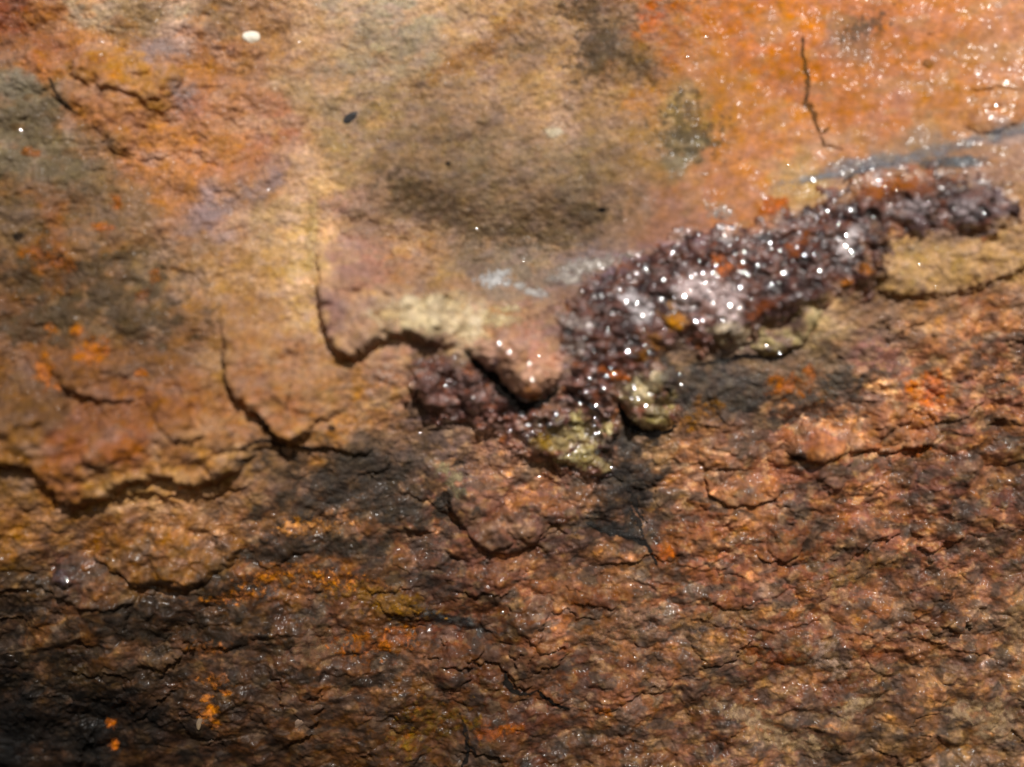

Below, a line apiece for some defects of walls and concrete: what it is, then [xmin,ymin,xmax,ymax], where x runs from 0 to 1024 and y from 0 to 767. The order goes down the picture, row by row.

crack [801,36,896,183]
rust [865,174,919,199]
rust [70,325,110,364]
rust [634,312,685,362]
crack [221,351,335,458]
hole [512,404,527,414]
rust [598,367,631,382]
rust [904,368,949,409]
peeling [704,372,942,508]
rust [271,517,360,537]
rust [199,562,447,665]
rust [195,673,231,727]